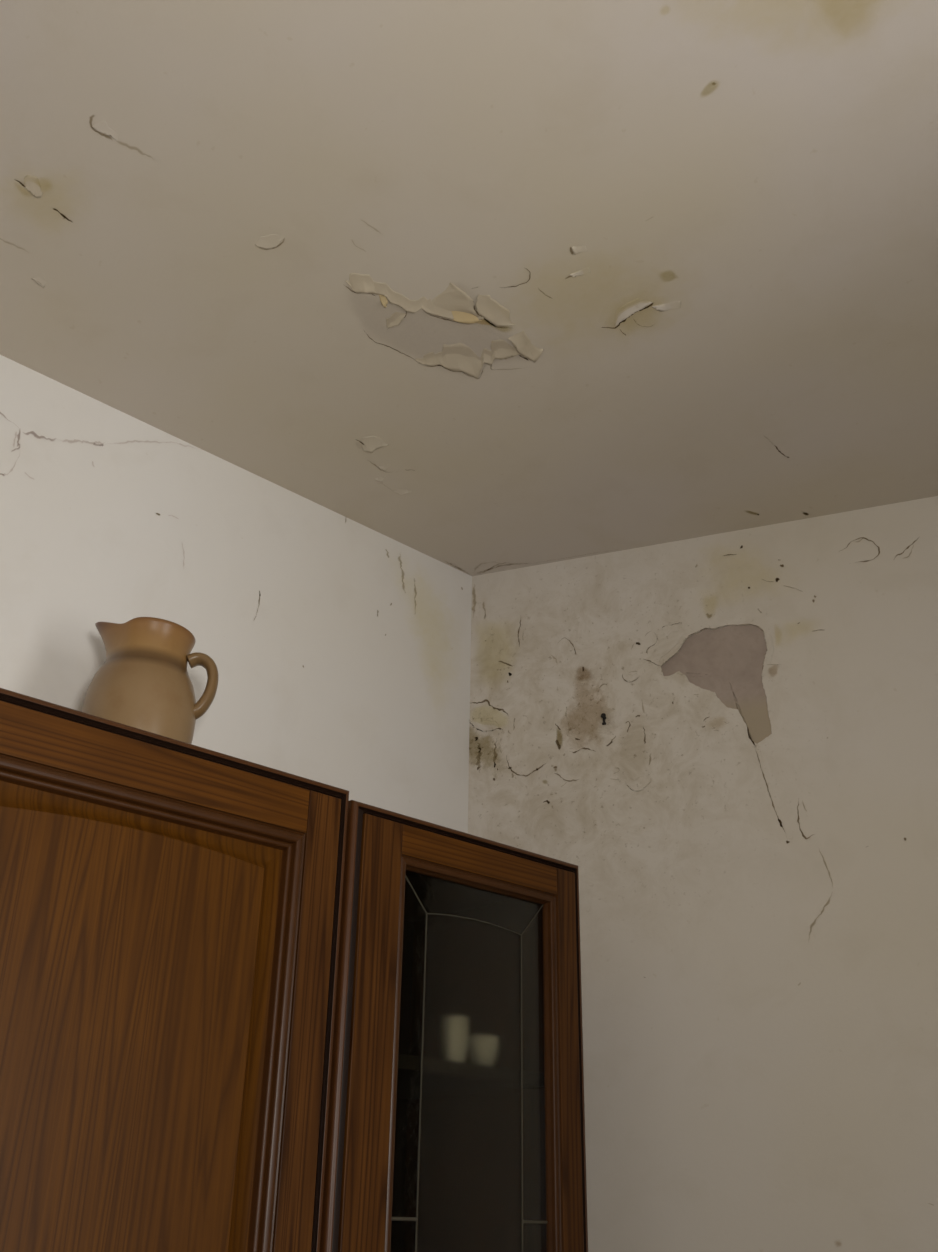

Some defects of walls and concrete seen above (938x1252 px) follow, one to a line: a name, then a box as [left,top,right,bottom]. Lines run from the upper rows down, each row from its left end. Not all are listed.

peeling [346,273,543,379]
spalling [636,622,774,745]
crack [757,754,812,843]